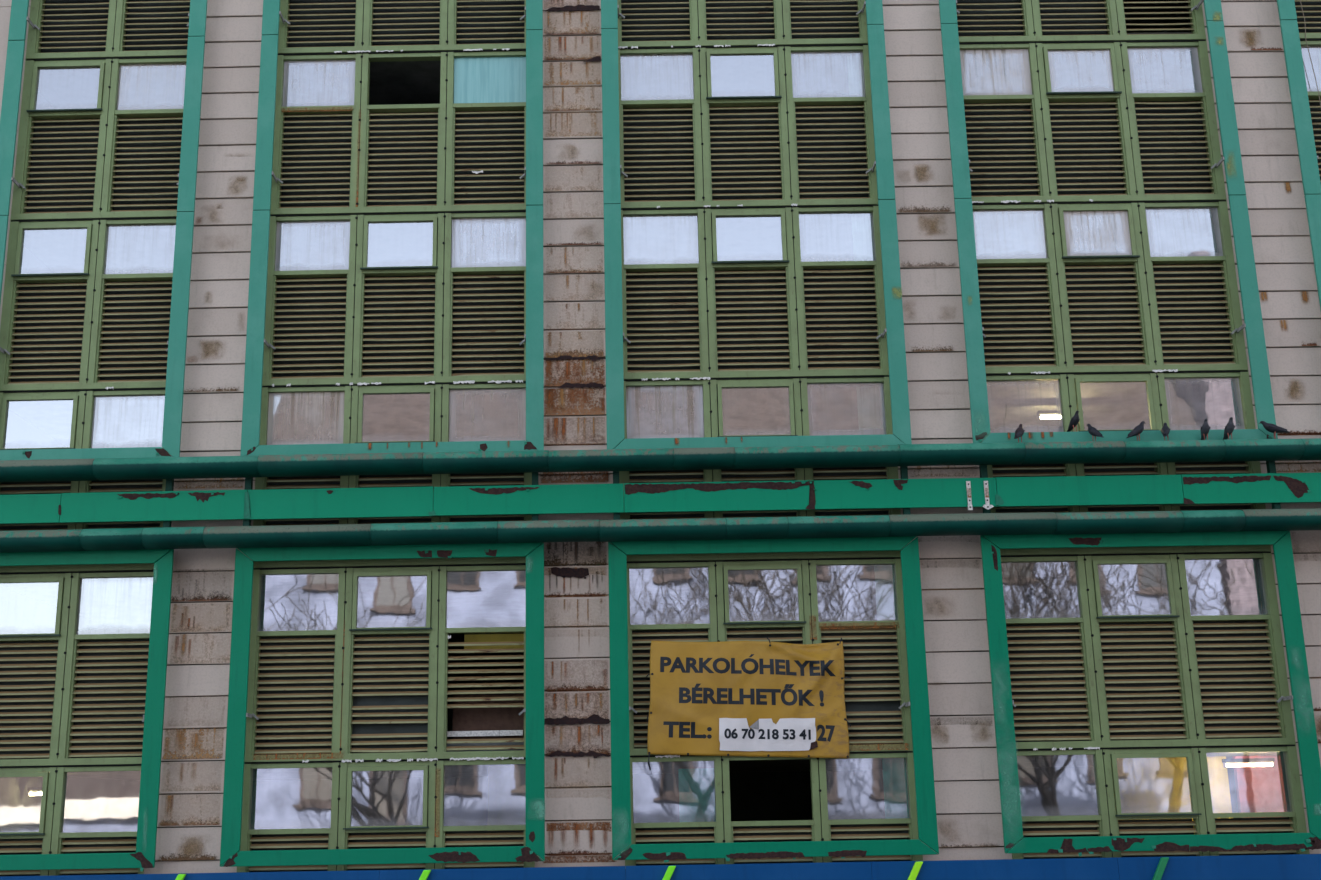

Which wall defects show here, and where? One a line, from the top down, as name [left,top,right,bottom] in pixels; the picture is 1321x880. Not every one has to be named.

corrosion [545,0,601,164]
corrosion [549,242,601,285]
corrosion [544,329,606,446]
peeling [117,492,225,503]
peeling [625,481,816,509]
peeling [1183,475,1311,504]
corrosion [544,542,607,617]
corrosion [545,661,611,776]
corrosion [544,822,616,863]
peeling [1047,837,1321,857]